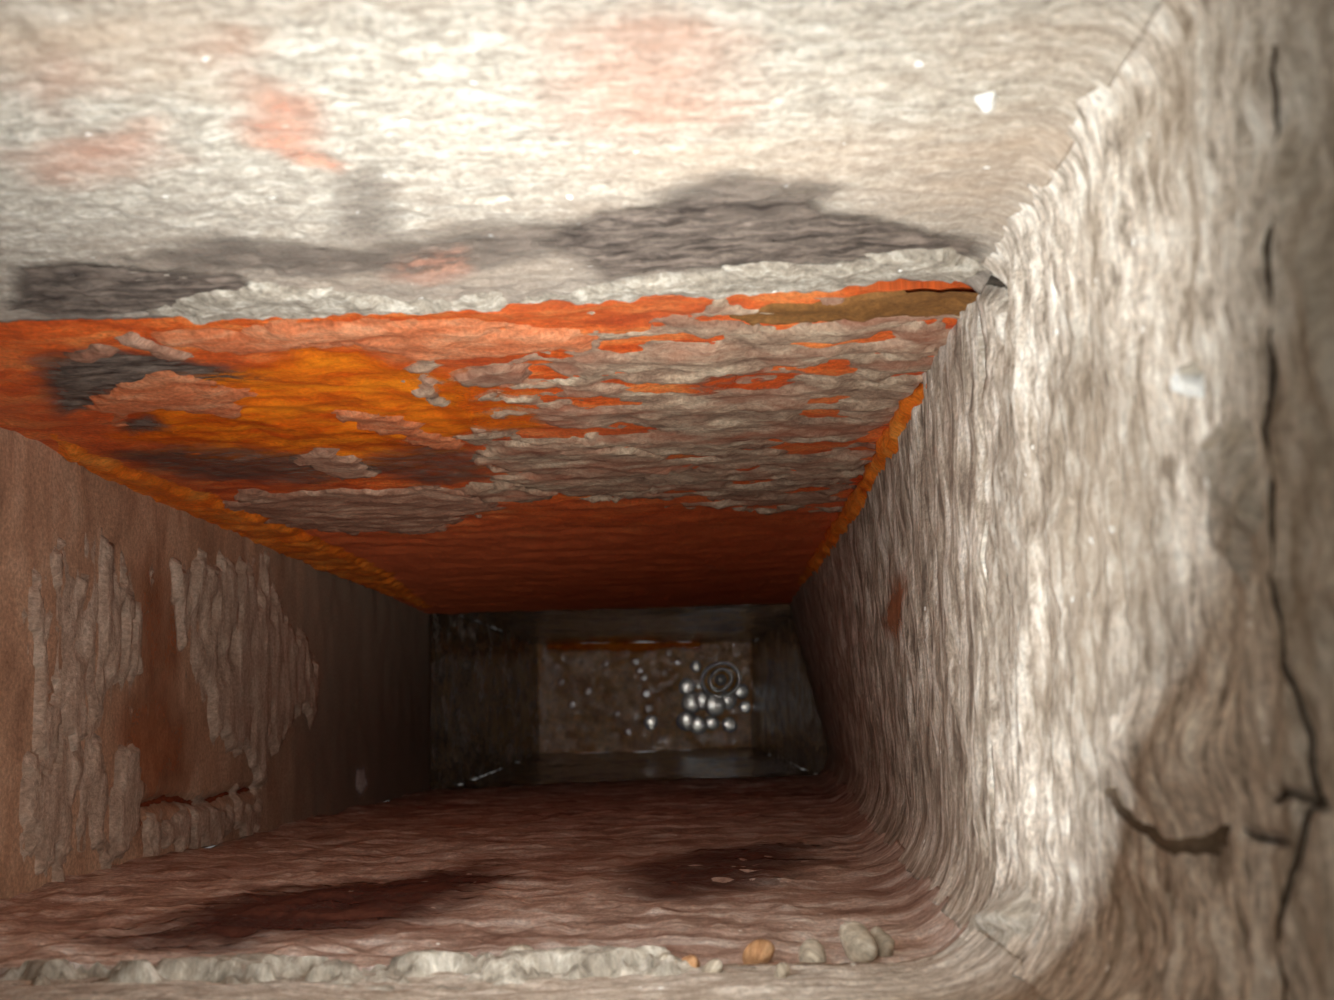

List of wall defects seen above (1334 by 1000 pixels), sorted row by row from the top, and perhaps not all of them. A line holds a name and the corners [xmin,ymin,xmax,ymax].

crack [1269,45,1280,154]
corrosion [125,348,532,468]
peeling [331,410,465,450]
spalling [64,248,986,427]
corrosion [700,373,761,393]
peeling [223,448,508,536]
spalling [796,383,927,593]
corrosion [886,581,904,637]
crack [1242,223,1329,1000]
peeling [19,527,319,882]
damp [633,843,809,898]